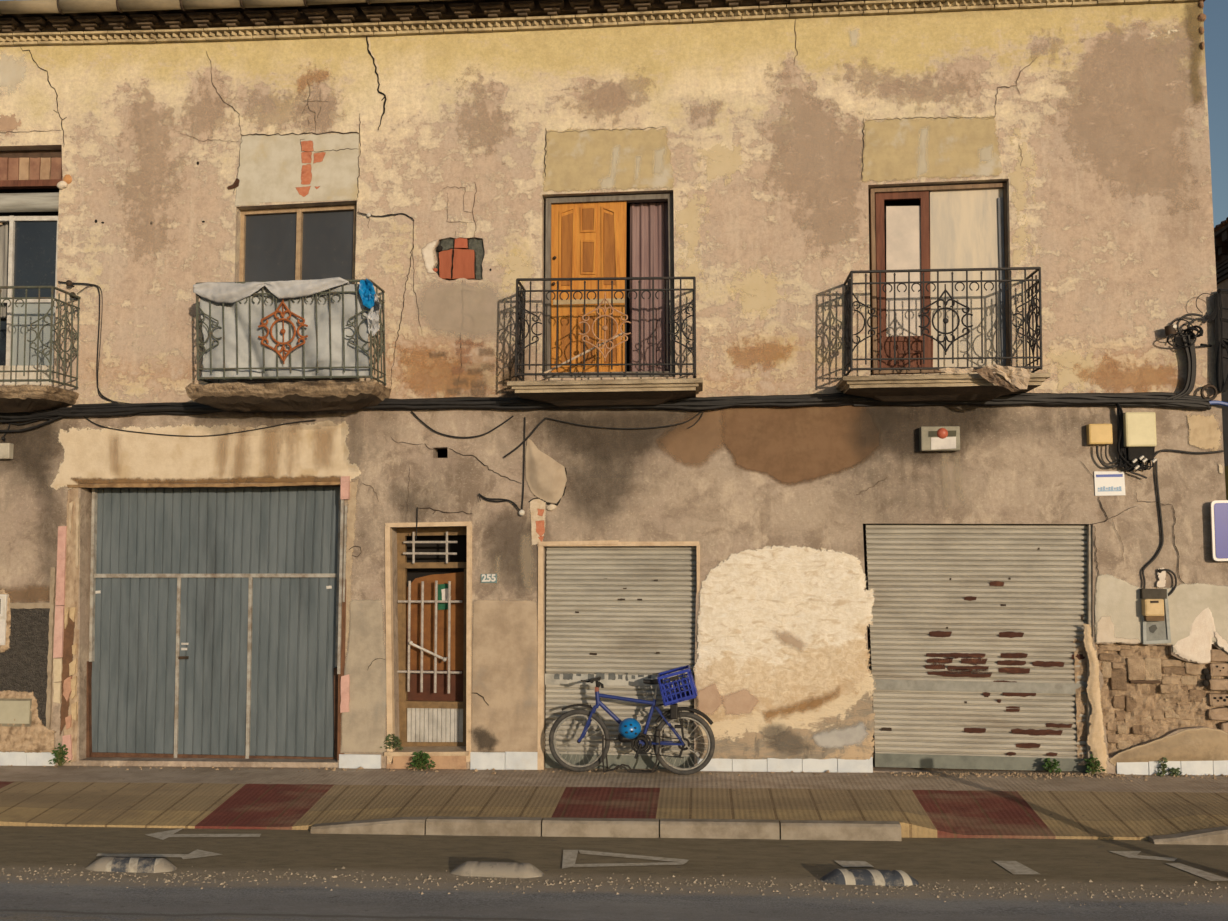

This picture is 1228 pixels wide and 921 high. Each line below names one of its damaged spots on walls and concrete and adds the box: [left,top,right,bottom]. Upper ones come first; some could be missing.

crack [1,47,66,147]
crack [861,57,1037,174]
spalling [296,141,326,197]
crack [178,36,422,385]
crack [444,184,477,241]
spalling [422,238,535,288]
rust [925,653,1085,712]
spalling [1073,615,1228,773]
rust [1007,723,1073,756]